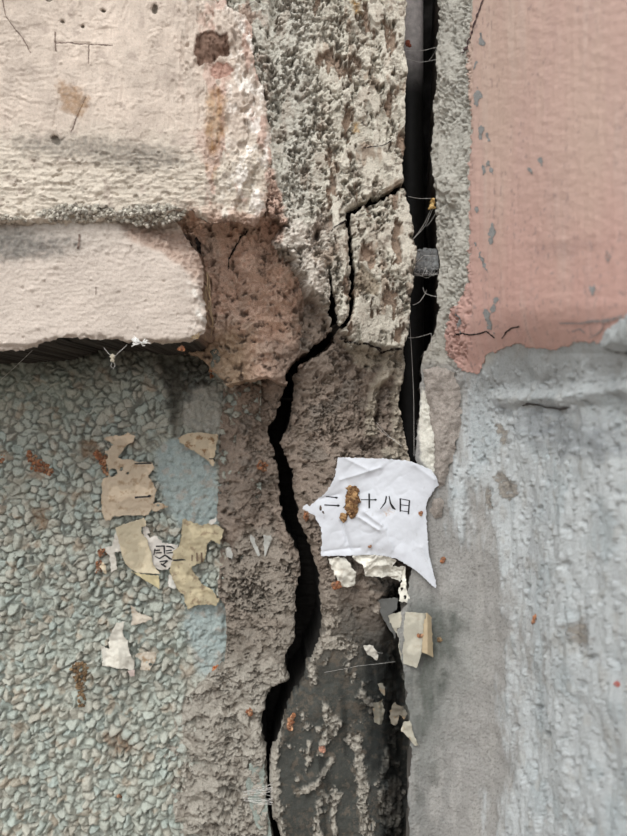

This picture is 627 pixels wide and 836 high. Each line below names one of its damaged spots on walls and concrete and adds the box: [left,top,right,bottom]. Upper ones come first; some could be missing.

crack [461,0,483,53]
peeling [483,297,499,334]
crack [261,184,407,836]